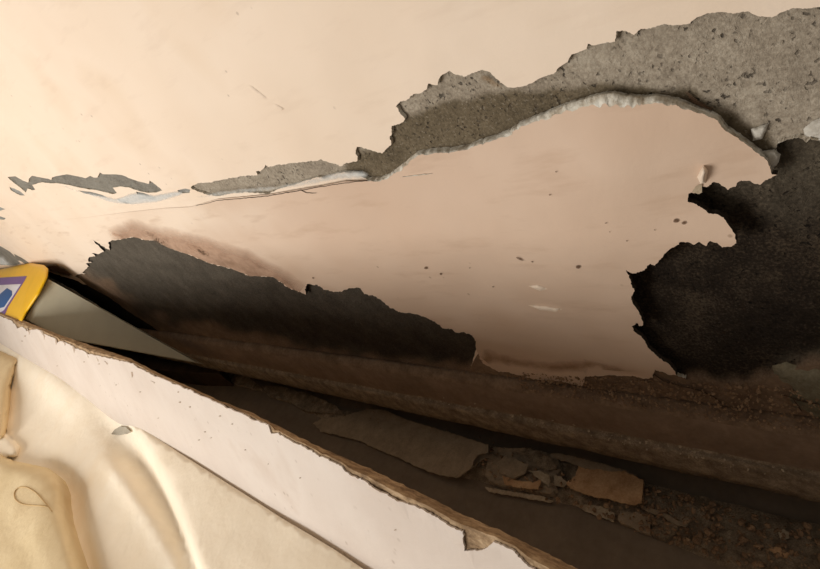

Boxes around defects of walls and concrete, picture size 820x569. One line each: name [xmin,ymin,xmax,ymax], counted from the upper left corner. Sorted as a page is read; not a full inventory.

peeling [179,7,820,195]
peeling [10,173,161,196]
peeling [76,237,476,371]
water stain [631,138,820,386]
peeling [473,450,688,527]